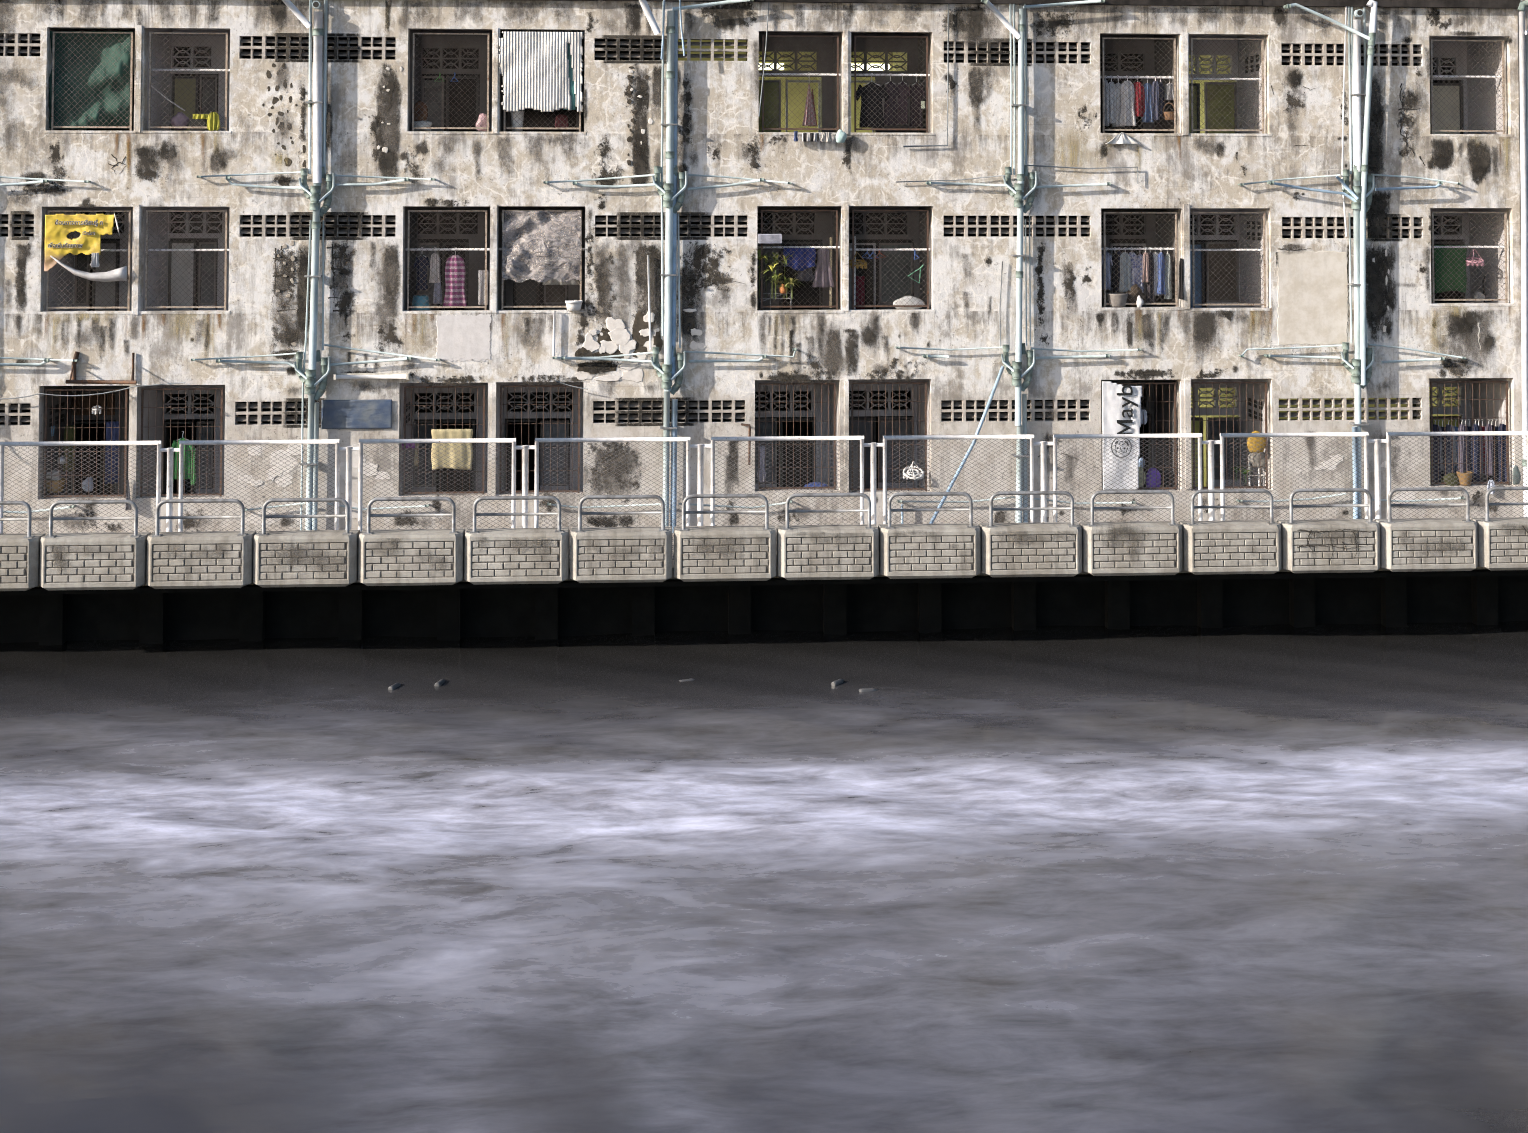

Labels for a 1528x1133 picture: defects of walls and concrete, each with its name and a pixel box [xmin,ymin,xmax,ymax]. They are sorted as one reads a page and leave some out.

water stain [135,140,181,185]
water stain [210,148,237,171]
water stain [256,0,360,186]
water stain [370,64,467,208]
water stain [1368,8,1498,184]
water stain [271,212,482,428]
flaking render [572,310,663,382]
spalling [594,400,745,422]
flaking render [683,309,707,350]
water stain [510,1,930,527]
water stain [1347,192,1432,342]
water stain [1432,311,1495,378]